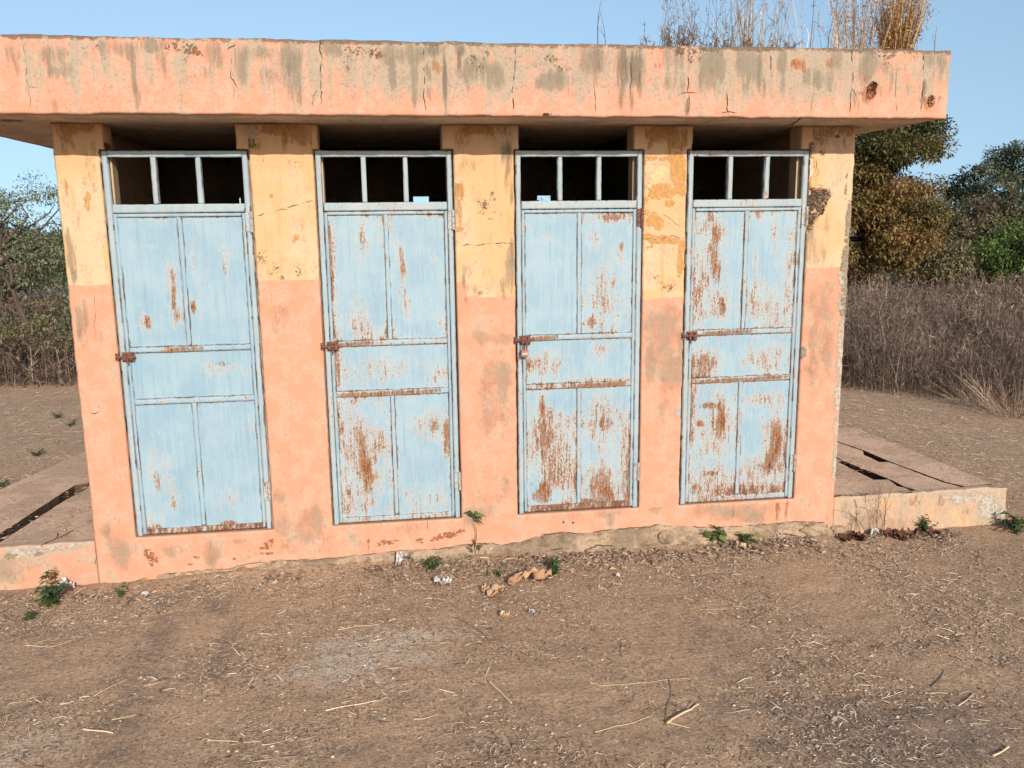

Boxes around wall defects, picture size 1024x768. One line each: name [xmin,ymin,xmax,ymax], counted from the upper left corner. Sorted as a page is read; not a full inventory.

water stain [408,46,500,100]
water stain [618,48,642,81]
spalling [866,81,878,99]
flaking render [806,143,831,232]
peeling [644,151,687,292]
rust [707,213,726,315]
rust [338,388,441,397]
rust [690,393,726,440]
rust [691,354,791,383]
rust [355,425,374,494]
rust [576,469,630,503]
rust [755,417,782,472]